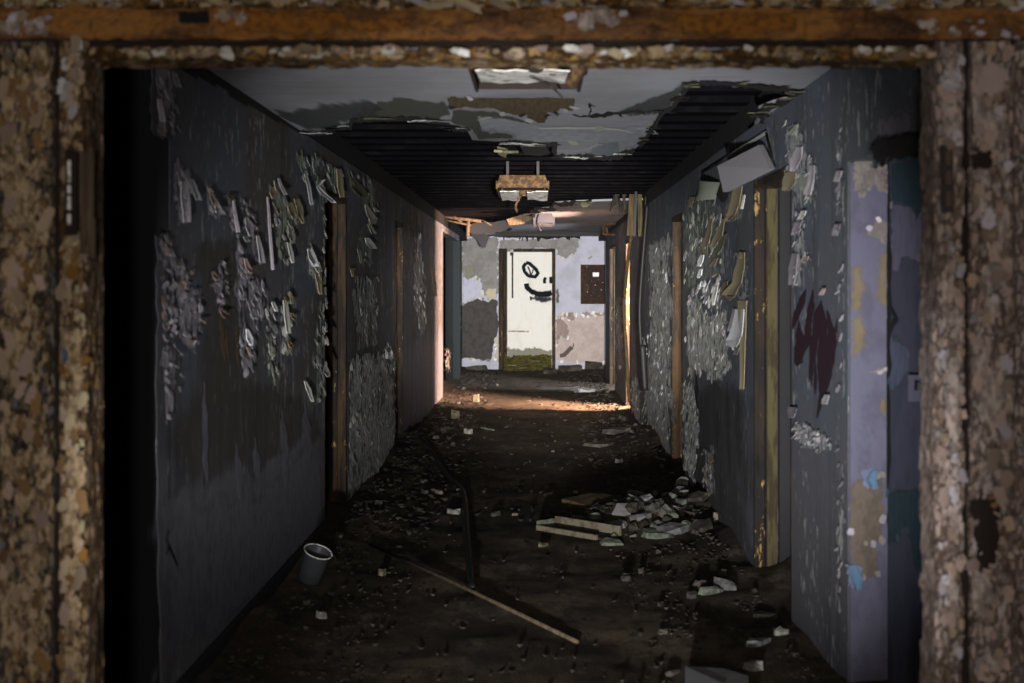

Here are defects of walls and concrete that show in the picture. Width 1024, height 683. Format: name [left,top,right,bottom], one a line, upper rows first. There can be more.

rust [212,7,346,37]
spalling [447,96,658,156]
peeling [782,120,821,287]
spalling [832,129,922,272]
peeling [159,151,398,499]
spalling [445,234,579,372]
spalling [555,289,624,380]
peeling [630,186,749,500]
peeling [819,264,846,373]
spalling [787,407,922,614]